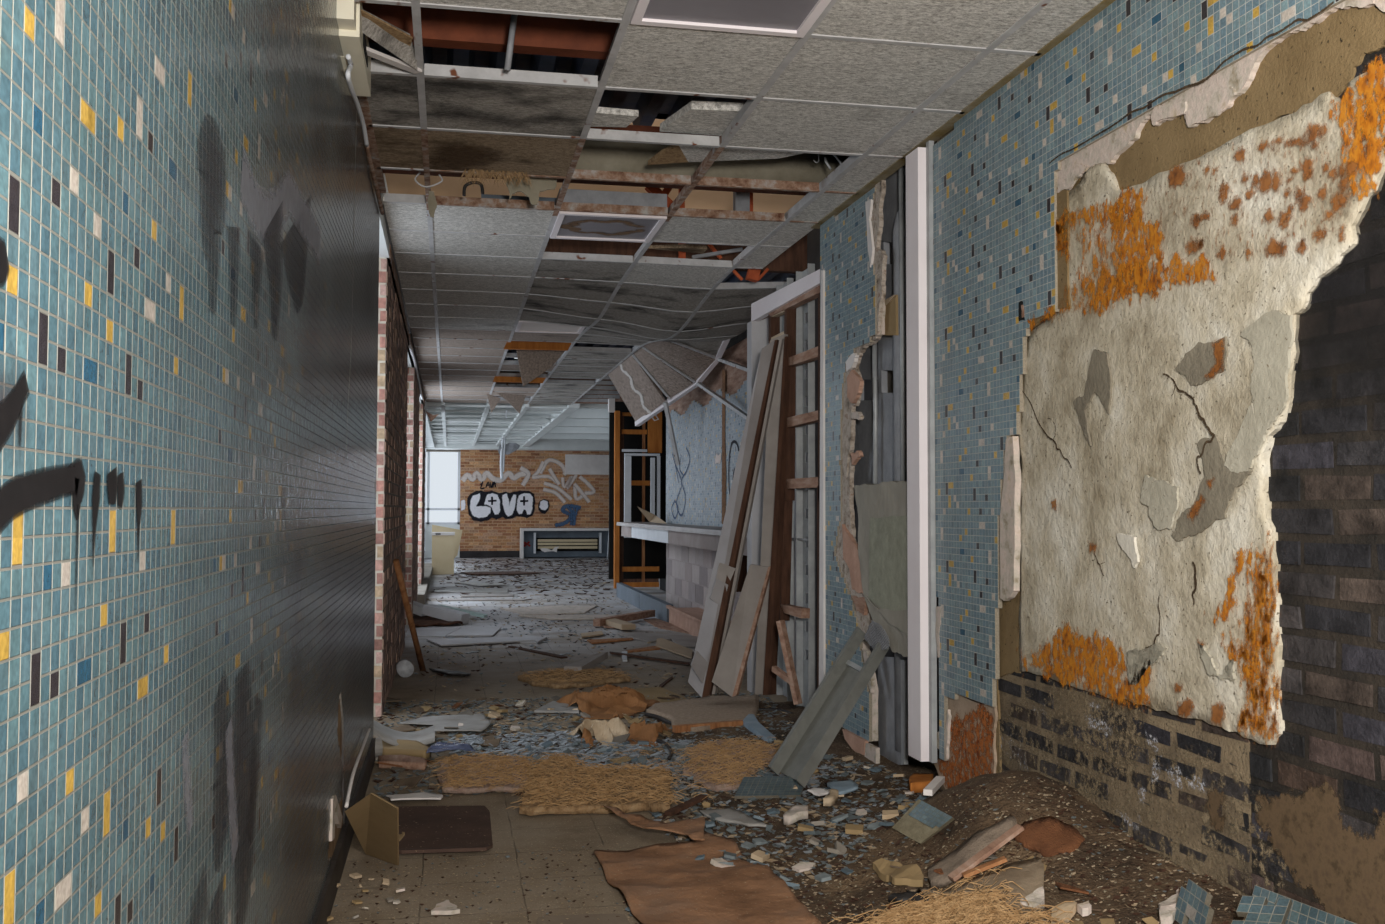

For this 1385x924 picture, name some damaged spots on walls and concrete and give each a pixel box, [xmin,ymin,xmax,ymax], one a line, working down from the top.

spalling [1057,0,1385,193]
rust [1027,54,1385,331]
spalling [836,180,908,693]
spalling [1073,349,1112,446]
rust [1189,480,1213,519]
peeling [1116,533,1140,568]
rust [1016,622,1152,711]
peeling [1126,643,1167,685]
peeling [1198,644,1236,680]
rust [1175,531,1282,745]
rust [938,703,994,788]